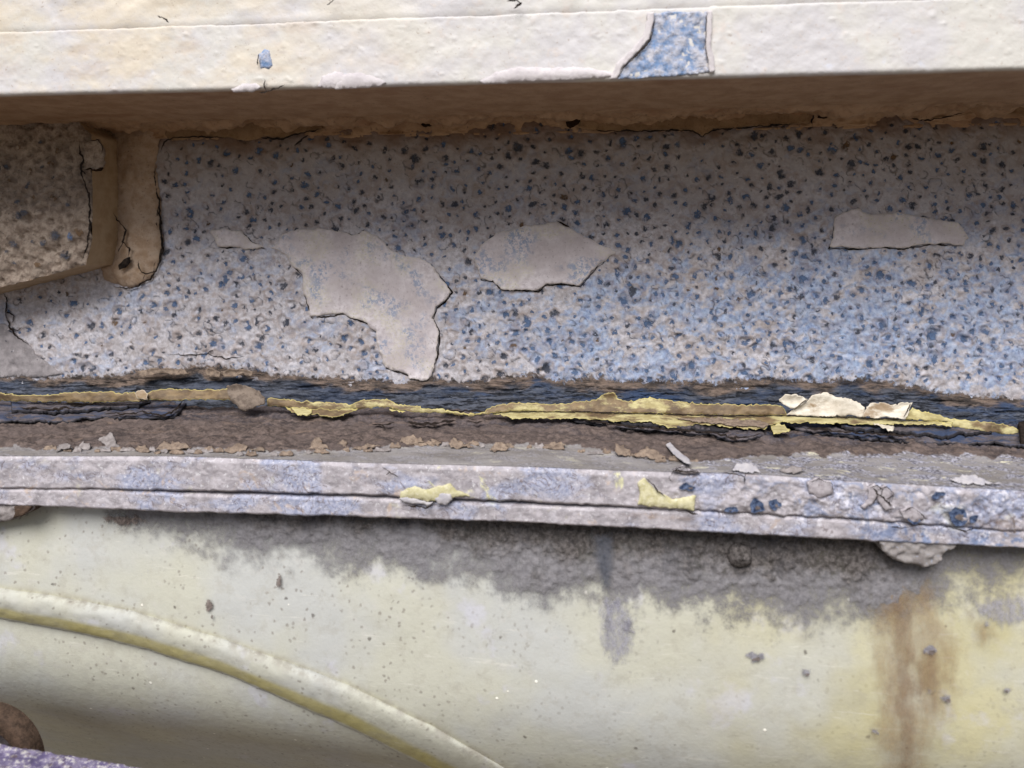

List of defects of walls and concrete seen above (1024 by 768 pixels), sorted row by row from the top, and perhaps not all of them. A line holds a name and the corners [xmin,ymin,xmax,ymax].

peeling [480,11,715,84]
crack [79,142,165,289]
peeling [0,112,1024,441]
crack [4,294,26,343]
peeling [43,432,514,457]
peeling [527,441,699,462]
peeling [399,483,470,509]
peeling [637,478,697,515]
spalling [724,498,782,513]